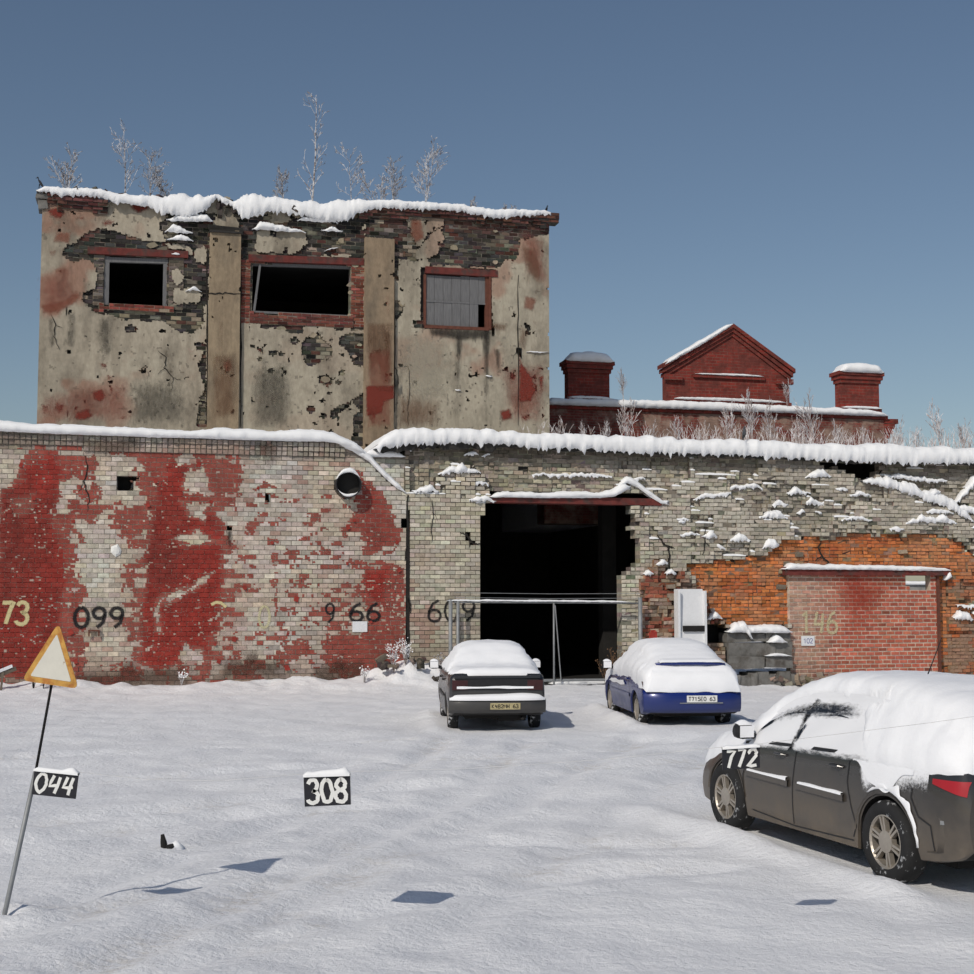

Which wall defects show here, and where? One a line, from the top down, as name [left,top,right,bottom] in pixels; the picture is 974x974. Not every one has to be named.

spalling [43,212,217,427]
spalling [233,211,549,447]
crack [79,456,90,511]
peeling [0,445,410,685]
crack [815,540,829,564]